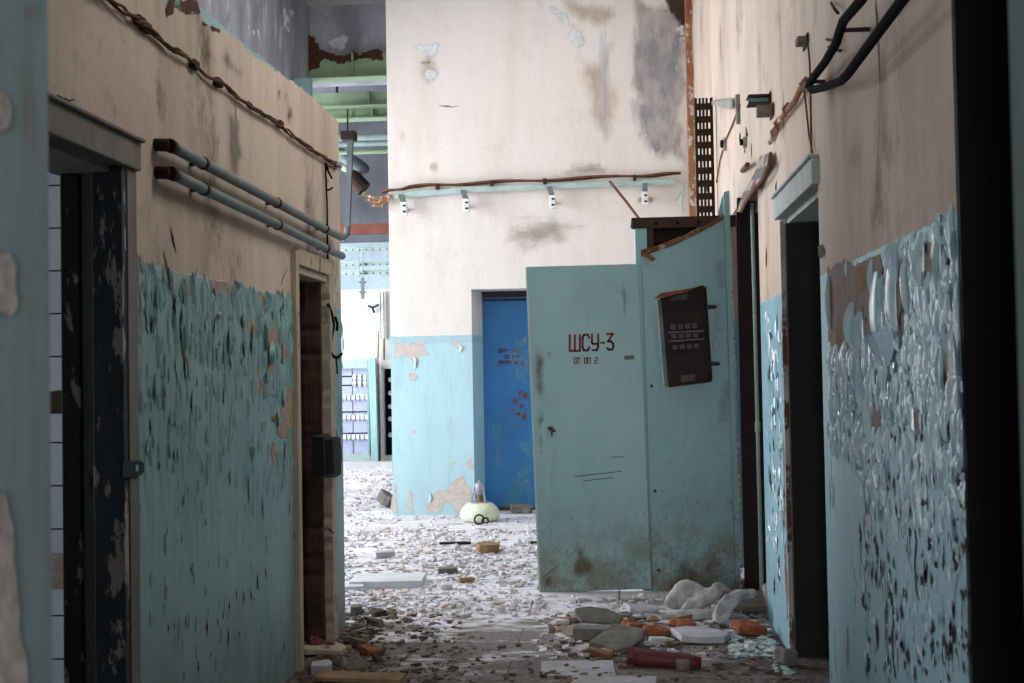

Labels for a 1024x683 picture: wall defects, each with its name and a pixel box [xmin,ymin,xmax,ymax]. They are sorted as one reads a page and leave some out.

damp [635,4,683,157]
peeling [137,254,294,526]
peeling [334,303,344,440]
peeling [394,341,429,381]
peeling [391,458,473,514]
peeling [765,312,784,596]
peeling [825,204,969,683]
peeling [149,565,267,653]